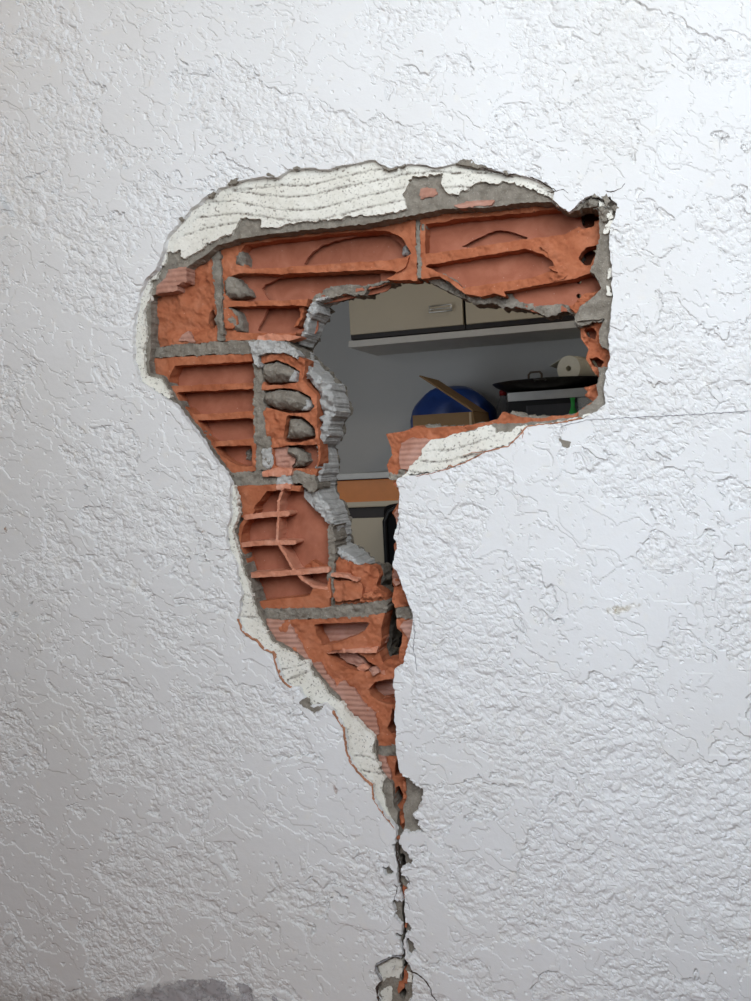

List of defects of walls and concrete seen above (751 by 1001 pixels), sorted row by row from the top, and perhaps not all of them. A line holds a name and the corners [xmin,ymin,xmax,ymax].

spalling [135,159,619,1001]